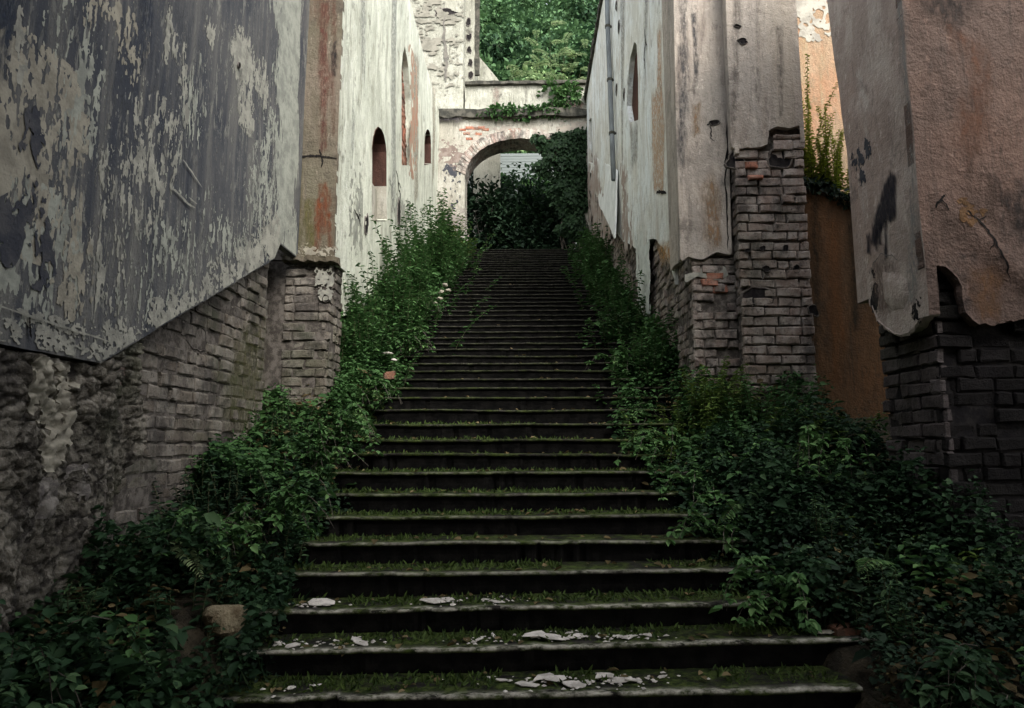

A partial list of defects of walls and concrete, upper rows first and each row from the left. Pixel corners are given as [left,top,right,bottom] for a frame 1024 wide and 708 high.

peeling [796,0,831,42]
peeling [0,0,338,519]
flaking render [684,134,819,413]
peeling [869,261,923,337]
crack [935,195,1011,279]